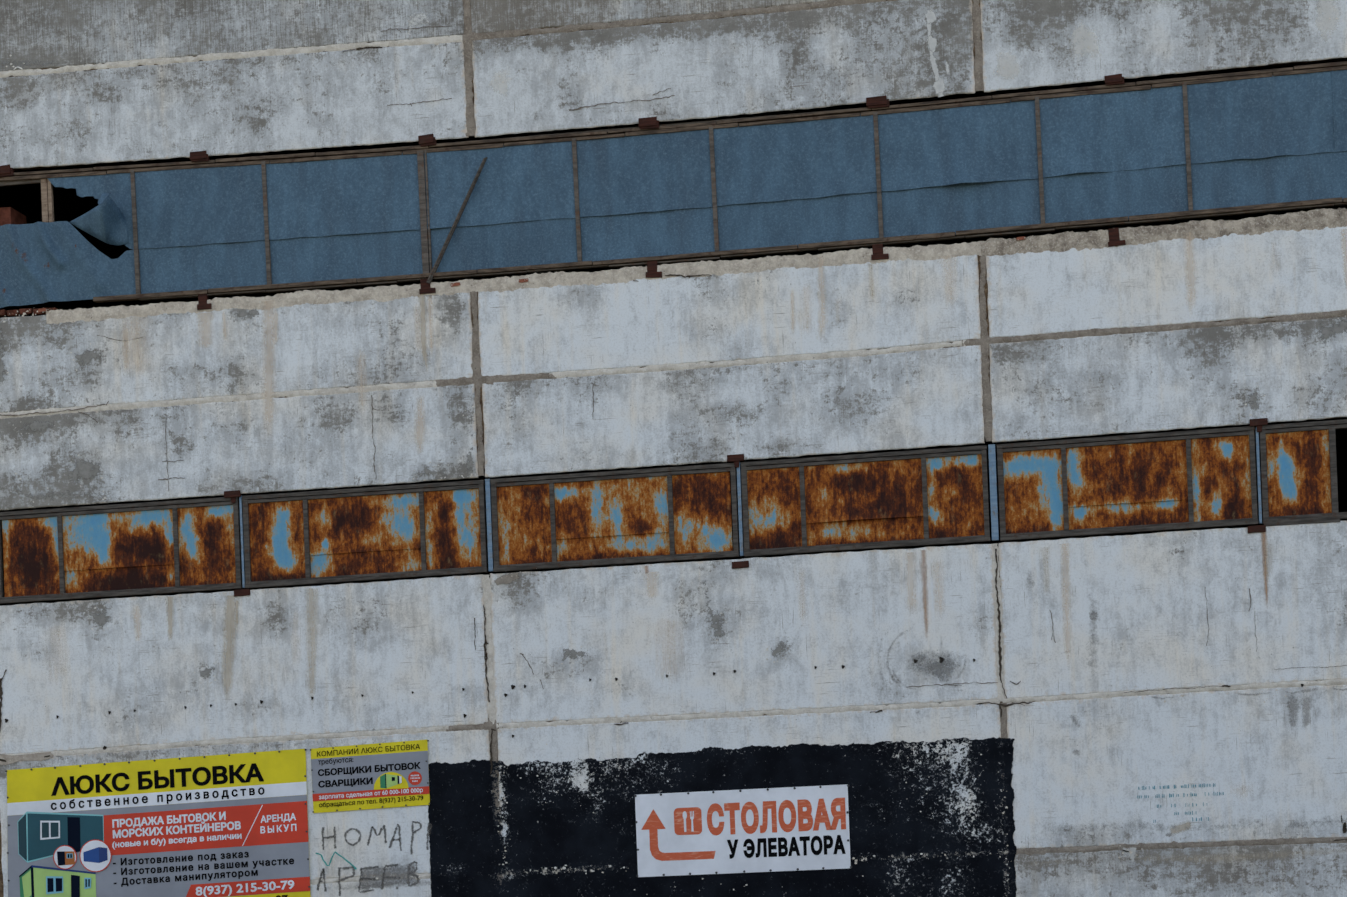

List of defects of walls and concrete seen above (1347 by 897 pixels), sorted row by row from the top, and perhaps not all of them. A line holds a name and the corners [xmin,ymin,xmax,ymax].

leakage [925,6,949,97]